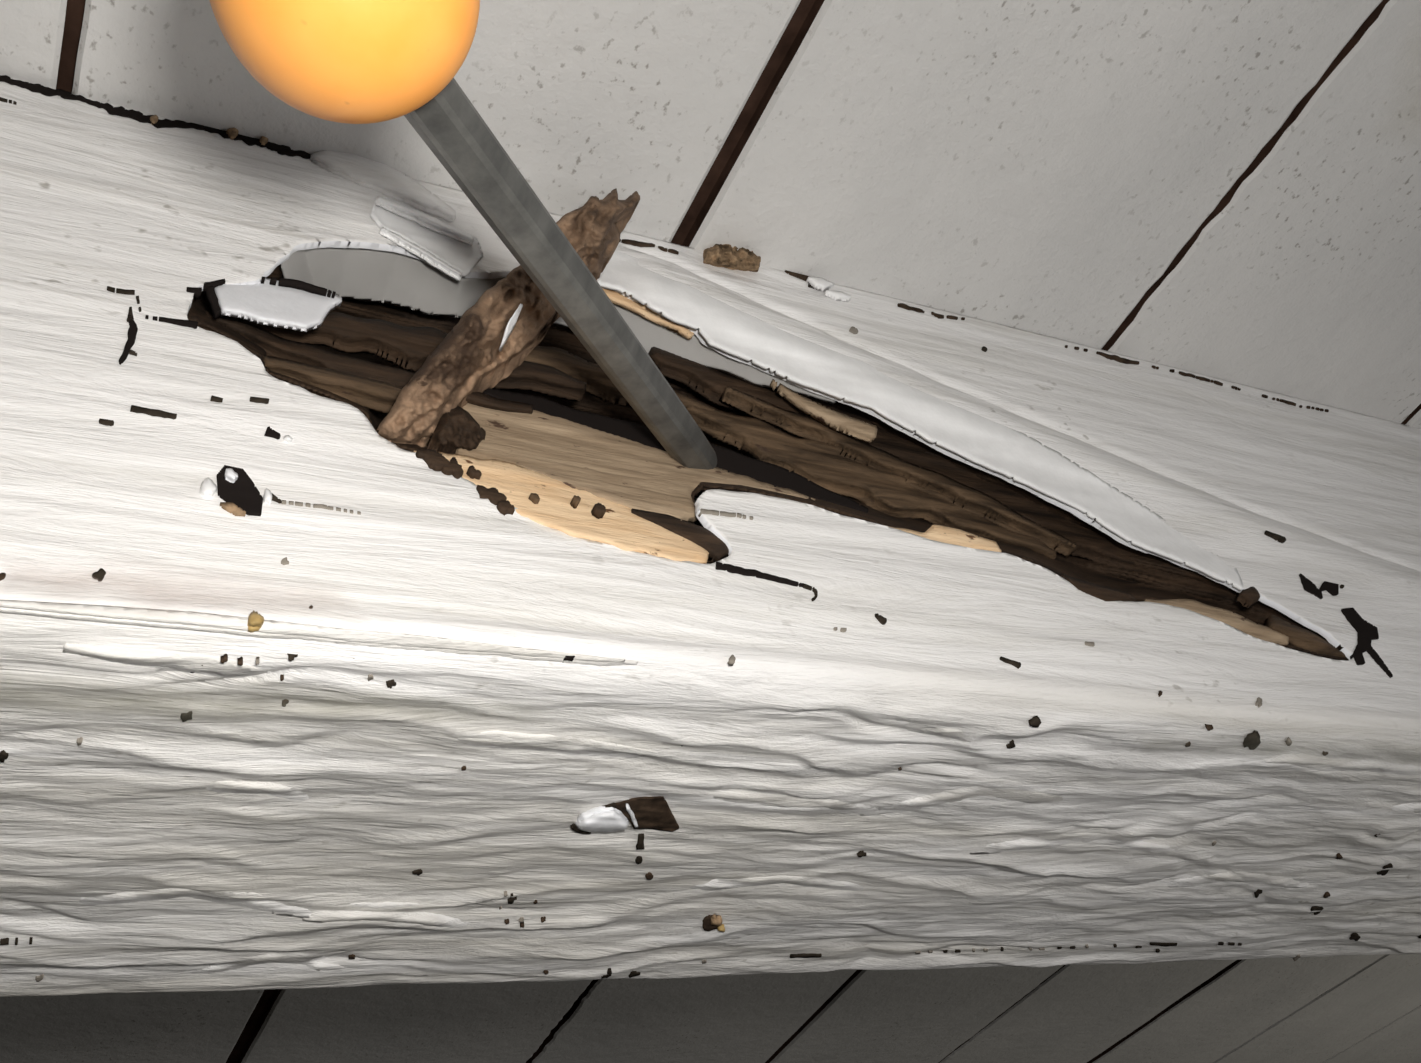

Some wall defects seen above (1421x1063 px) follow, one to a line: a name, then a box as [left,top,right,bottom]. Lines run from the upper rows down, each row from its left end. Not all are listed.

spalling [145,150,506,431]
peeling [264,427,293,443]
spalling [392,249,1393,678]
peeling [200,465,361,517]
crack [698,509,753,520]
crack [715,562,887,633]
peeling [570,796,679,834]